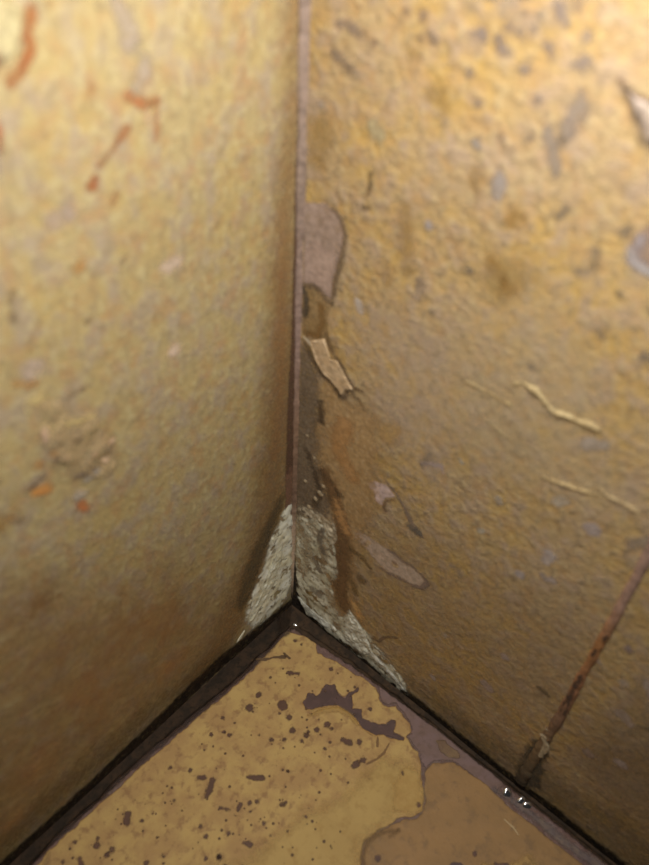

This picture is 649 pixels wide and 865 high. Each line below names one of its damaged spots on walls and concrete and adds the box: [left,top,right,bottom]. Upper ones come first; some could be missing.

peeling [617,79,649,144]
spalling [303,202,348,305]
spalling [627,226,649,275]
peeling [304,333,363,403]
water stain [188,141,407,692]
spalling [369,481,423,538]
spalling [355,531,430,589]
water stain [31,629,604,865]